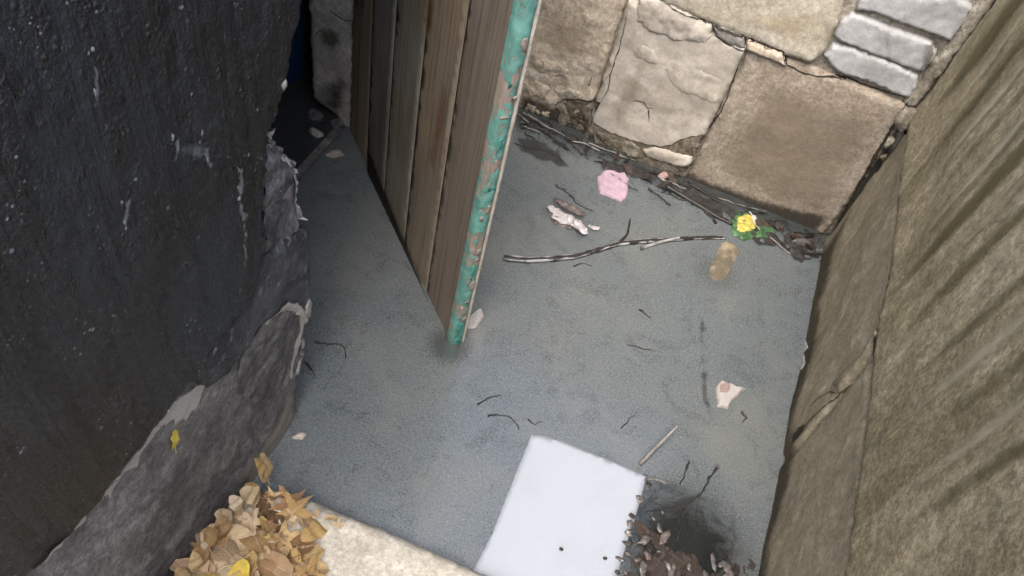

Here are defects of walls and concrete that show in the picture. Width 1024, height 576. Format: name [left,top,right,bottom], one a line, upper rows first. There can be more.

spalling [263,127,307,252]
peeling [454,249,482,345]
peeling [102,385,205,498]
peeling [238,298,312,406]
crack [804,371,873,427]
peeling [34,516,86,569]